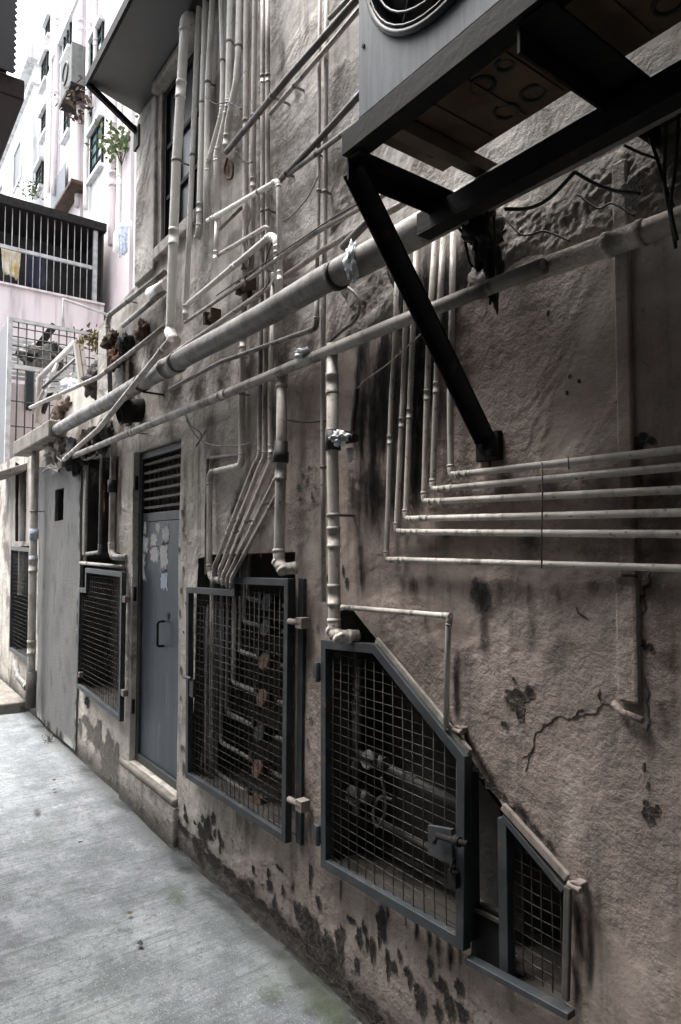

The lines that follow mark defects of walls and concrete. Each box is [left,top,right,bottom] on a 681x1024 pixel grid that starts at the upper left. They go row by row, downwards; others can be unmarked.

damp [387,269,403,314]
damp [420,238,479,300]
damp [349,325,440,522]
damp [468,578,501,649]
peeling [78,696,120,782]
flaking render [501,677,535,728]
crack [525,689,611,772]
flaking render [641,800,662,824]
damp [405,917,462,969]
damp [322,989,352,1024]